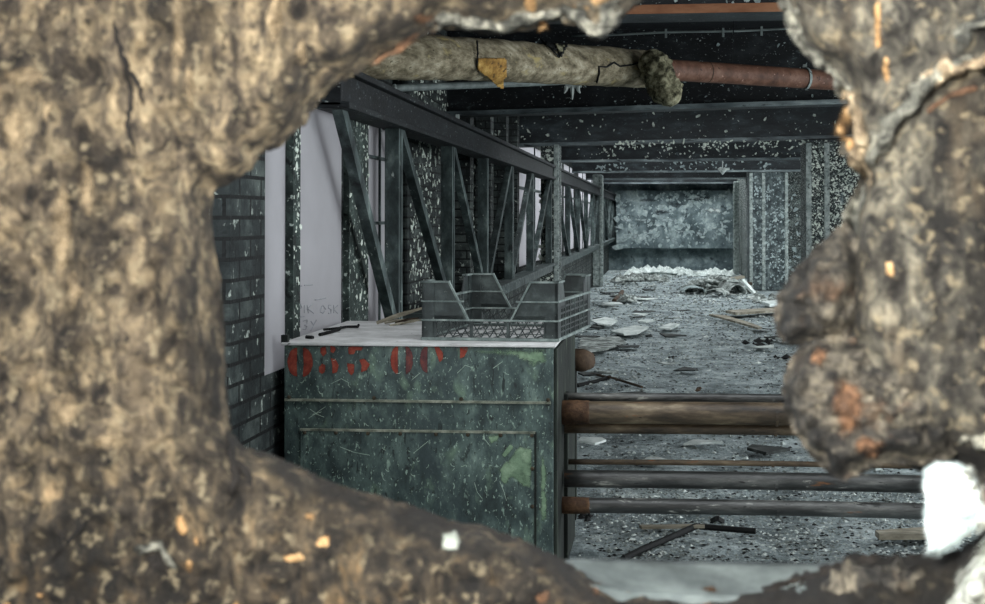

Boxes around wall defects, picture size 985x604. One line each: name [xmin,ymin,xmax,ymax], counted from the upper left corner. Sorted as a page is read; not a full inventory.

crack [113,19,144,160]
peeling [412,80,448,111]
peeling [294,132,302,233]
peeling [350,208,369,310]
peeling [409,141,441,309]
peeling [538,149,554,281]
peeling [577,102,859,286]
spalling [761,552,926,598]